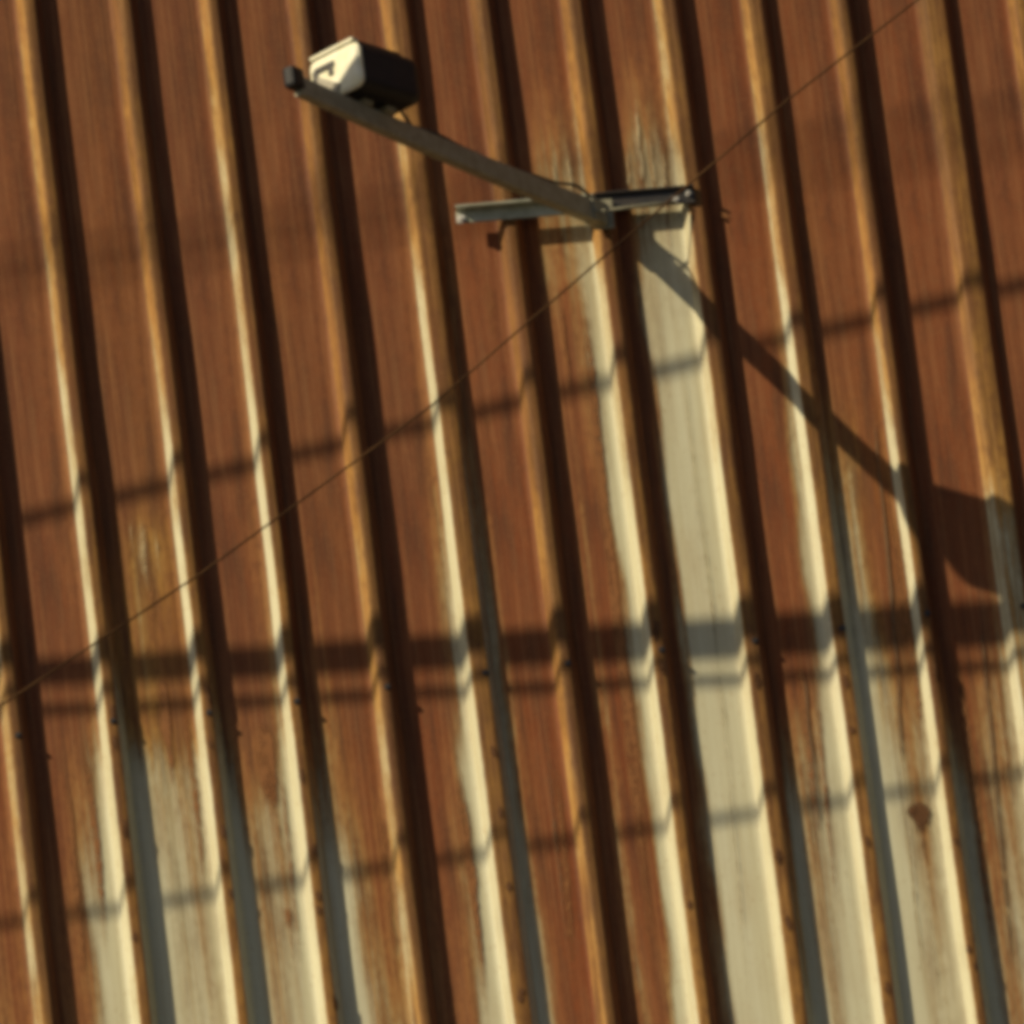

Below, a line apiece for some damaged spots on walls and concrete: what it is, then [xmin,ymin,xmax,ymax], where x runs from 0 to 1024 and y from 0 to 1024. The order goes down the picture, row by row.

rust [0,0,674,1024]
rust [413,0,1024,1024]